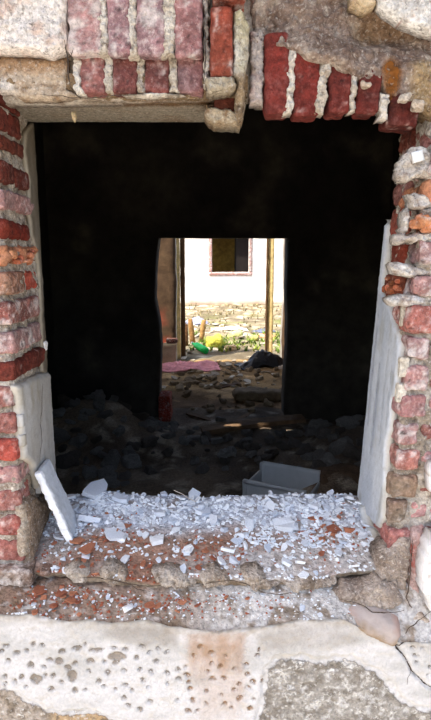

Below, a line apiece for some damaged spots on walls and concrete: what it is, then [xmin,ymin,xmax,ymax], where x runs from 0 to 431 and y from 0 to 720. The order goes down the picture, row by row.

peeling [8,123,431,646]
crack [186,540,431,687]